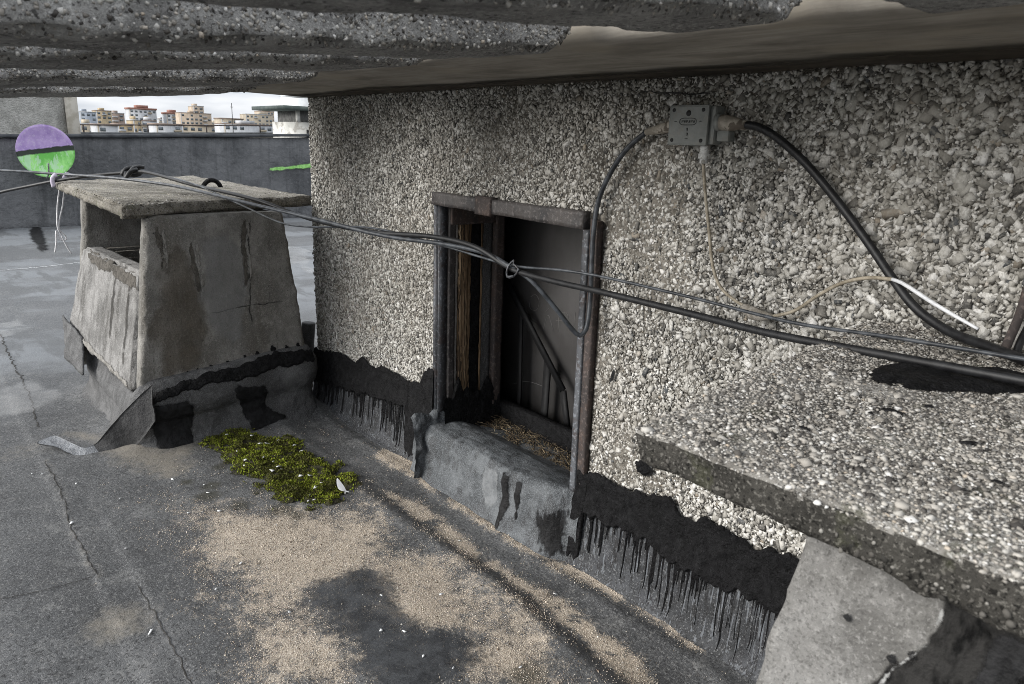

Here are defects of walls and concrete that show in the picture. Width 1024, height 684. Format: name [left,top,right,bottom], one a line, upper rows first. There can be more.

crack [213,220,278,321]
crack [0,334,39,427]
crack [7,461,98,598]
crack [136,583,192,684]